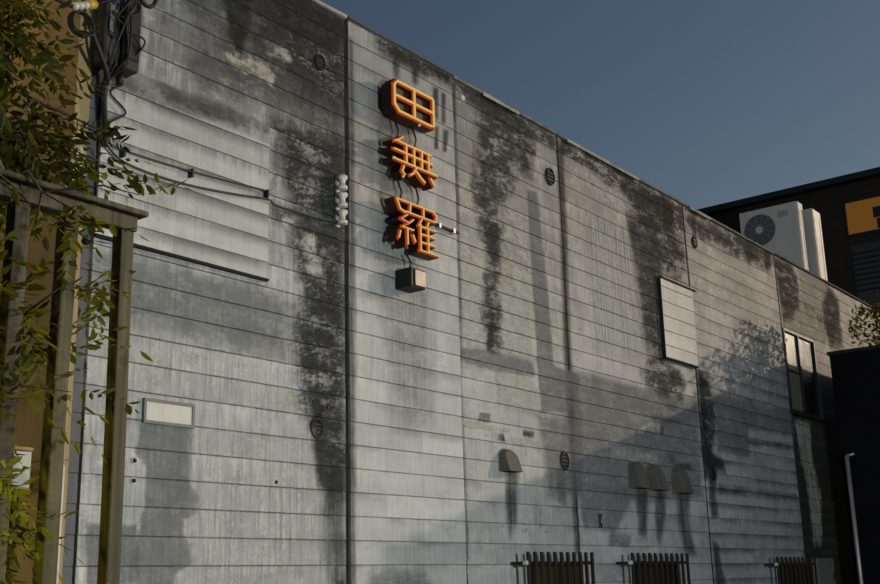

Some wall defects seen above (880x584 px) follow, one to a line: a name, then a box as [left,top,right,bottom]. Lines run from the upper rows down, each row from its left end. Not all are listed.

damp [98,255,112,308]
damp [120,0,355,584]
damp [377,38,841,552]
damp [86,525,100,584]